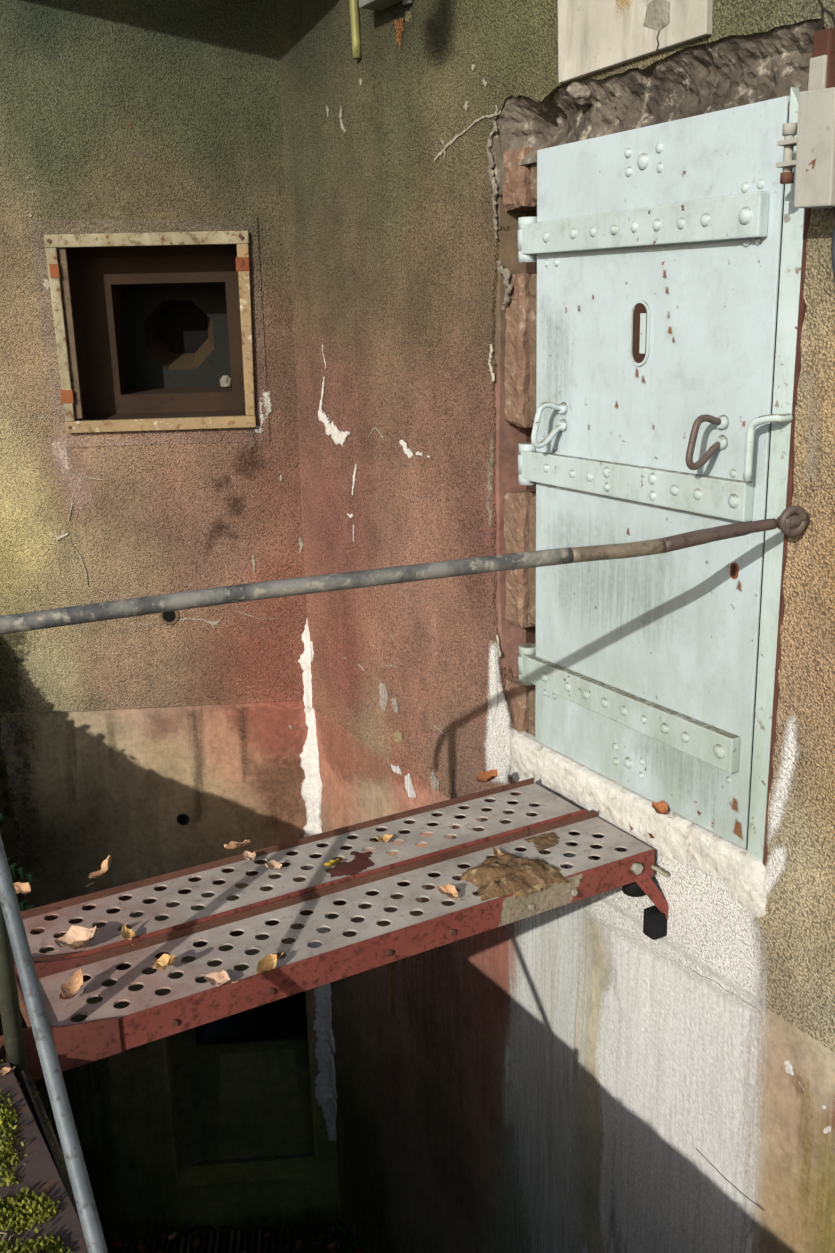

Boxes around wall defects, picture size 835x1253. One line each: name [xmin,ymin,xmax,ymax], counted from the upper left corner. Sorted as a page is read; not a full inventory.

crack [434,105,501,161]
spalling [486,0,826,239]
spalling [496,261,512,310]
water stain [243,391,272,476]
peeling [399,440,430,459]
spalling [486,433,494,526]